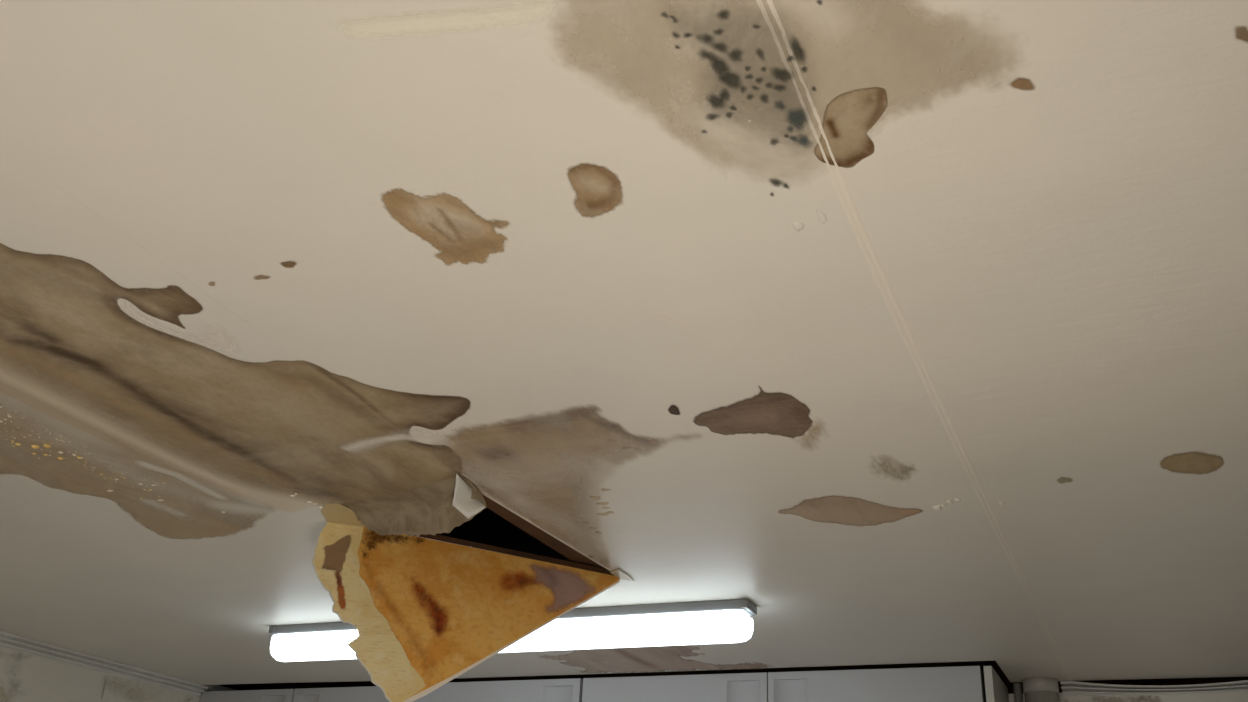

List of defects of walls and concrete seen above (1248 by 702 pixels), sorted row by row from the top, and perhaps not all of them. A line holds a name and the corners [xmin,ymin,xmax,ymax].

mould [663,12,808,145]
damp [382,189,509,265]
damp [568,164,622,217]
damp [0,243,658,505]
damp [0,406,256,539]
peeling [344,473,487,536]